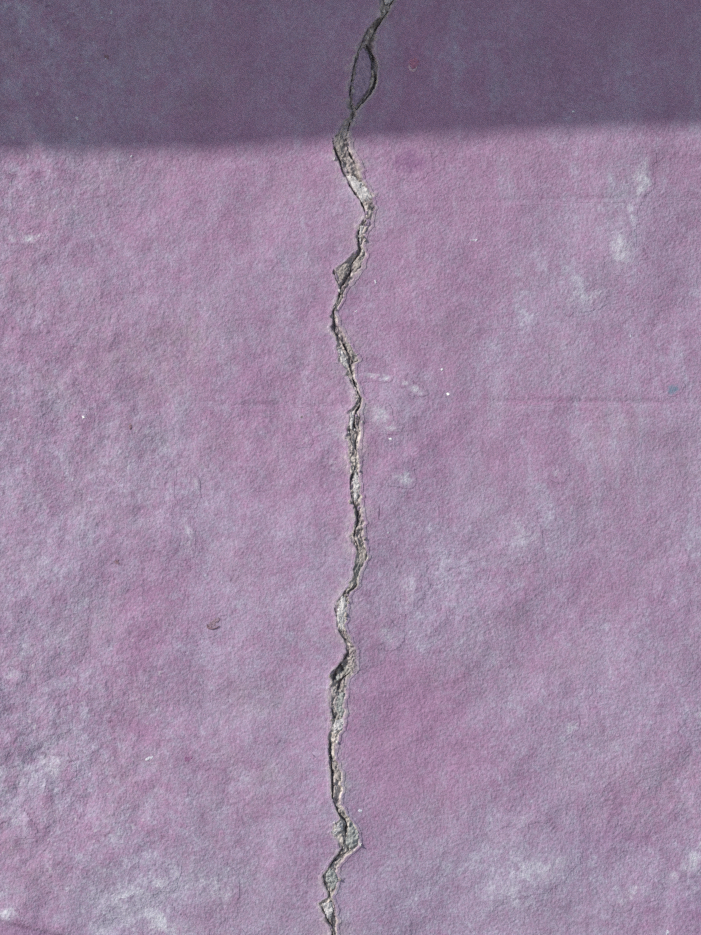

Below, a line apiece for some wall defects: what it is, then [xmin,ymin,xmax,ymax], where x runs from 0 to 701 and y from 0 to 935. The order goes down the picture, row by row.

crack [315,0,400,935]